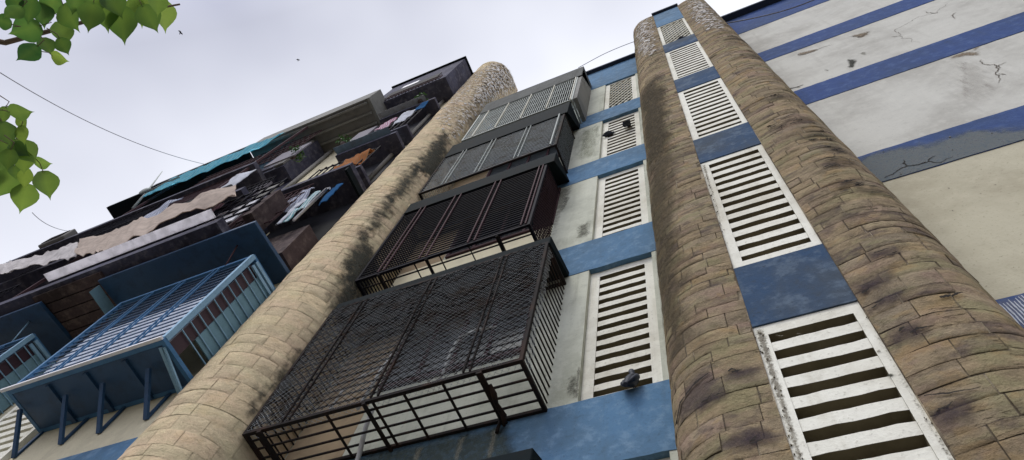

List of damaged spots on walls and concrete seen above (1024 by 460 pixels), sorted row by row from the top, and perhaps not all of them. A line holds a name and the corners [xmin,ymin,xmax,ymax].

damp [331,132,450,309]